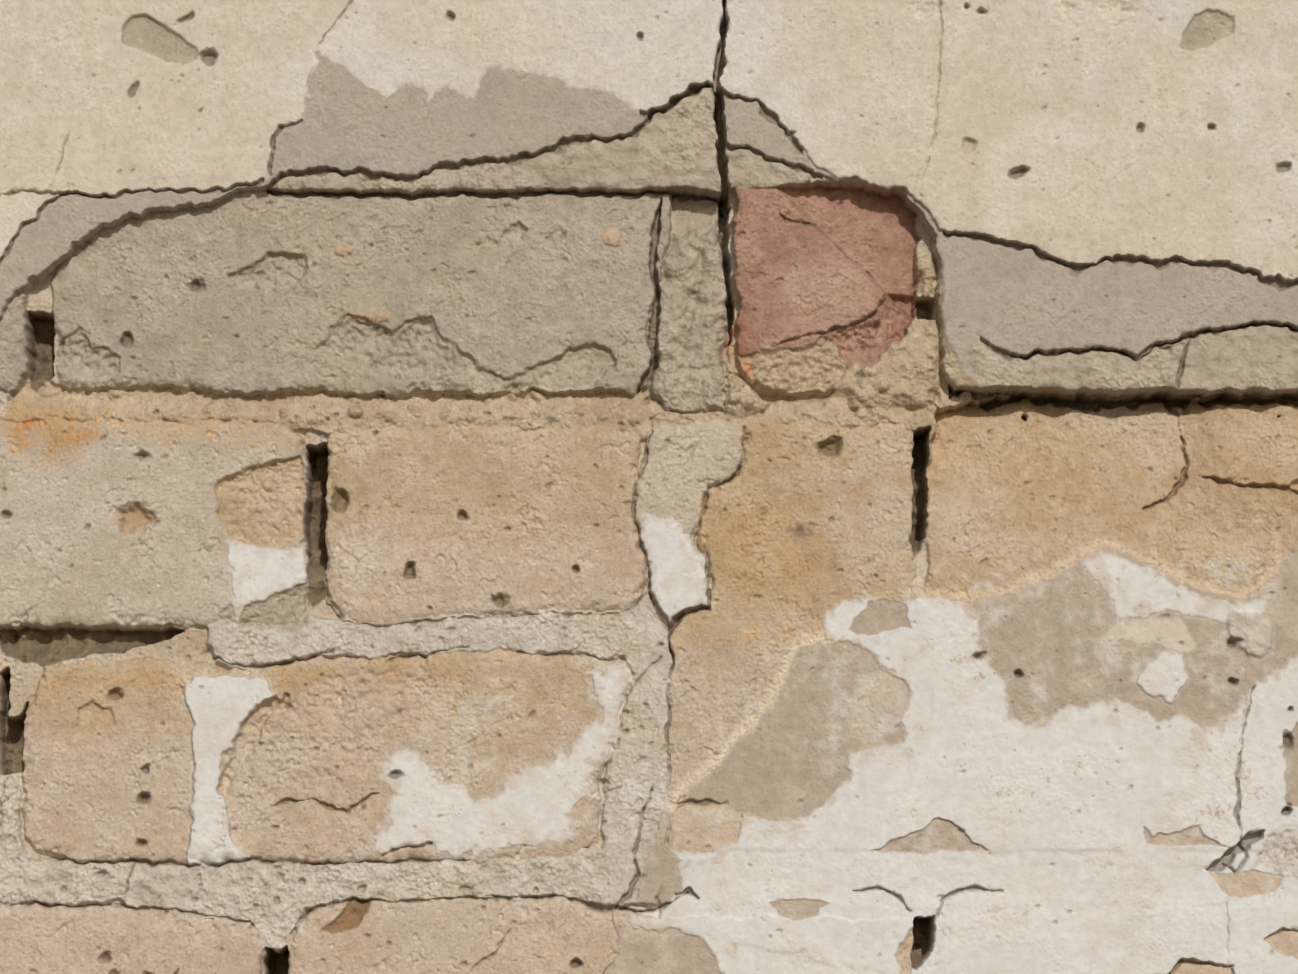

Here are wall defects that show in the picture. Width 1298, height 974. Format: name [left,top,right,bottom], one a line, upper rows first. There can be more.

crack [922,0,944,178]
flaking render [0,50,1298,403]
crack [772,204,888,350]
spalling [215,457,310,633]
crack [0,0,746,974]
peeling [642,514,712,618]
spalling [322,902,370,934]
peeling [185,661,635,864]
peeling [608,552,1298,974]
crack [1169,685,1265,974]
crack [1263,927,1298,941]